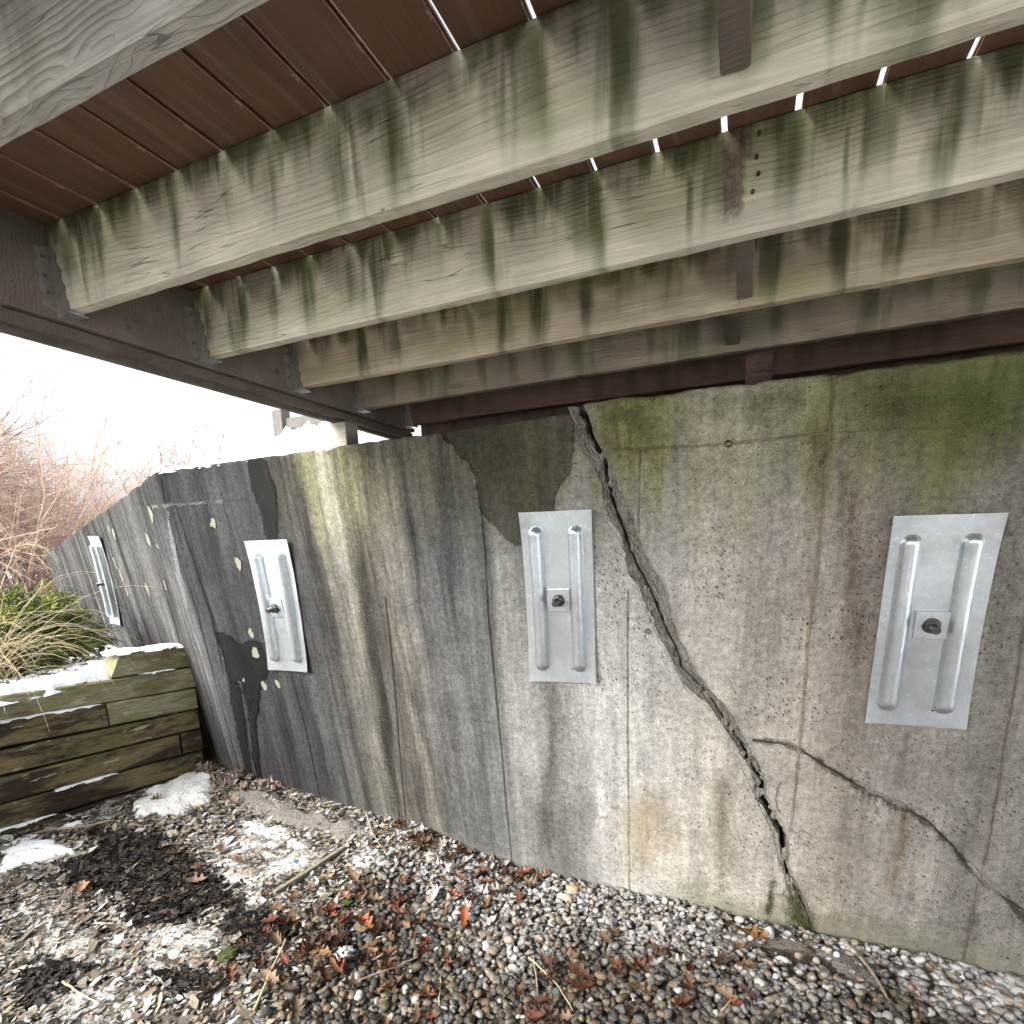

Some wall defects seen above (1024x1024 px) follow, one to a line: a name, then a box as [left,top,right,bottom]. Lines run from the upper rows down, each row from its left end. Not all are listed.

corrosion [724,126,744,214]
damp [215,632,268,780]
crack [568,404,1024,932]